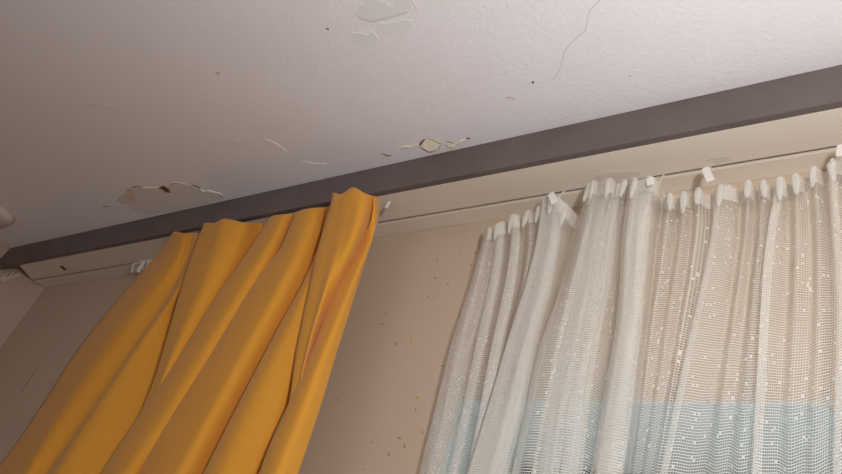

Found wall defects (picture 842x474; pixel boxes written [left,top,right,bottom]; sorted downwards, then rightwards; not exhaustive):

crack [550,0,600,81]
peeling [399,138,467,152]
flaking render [124,182,223,215]